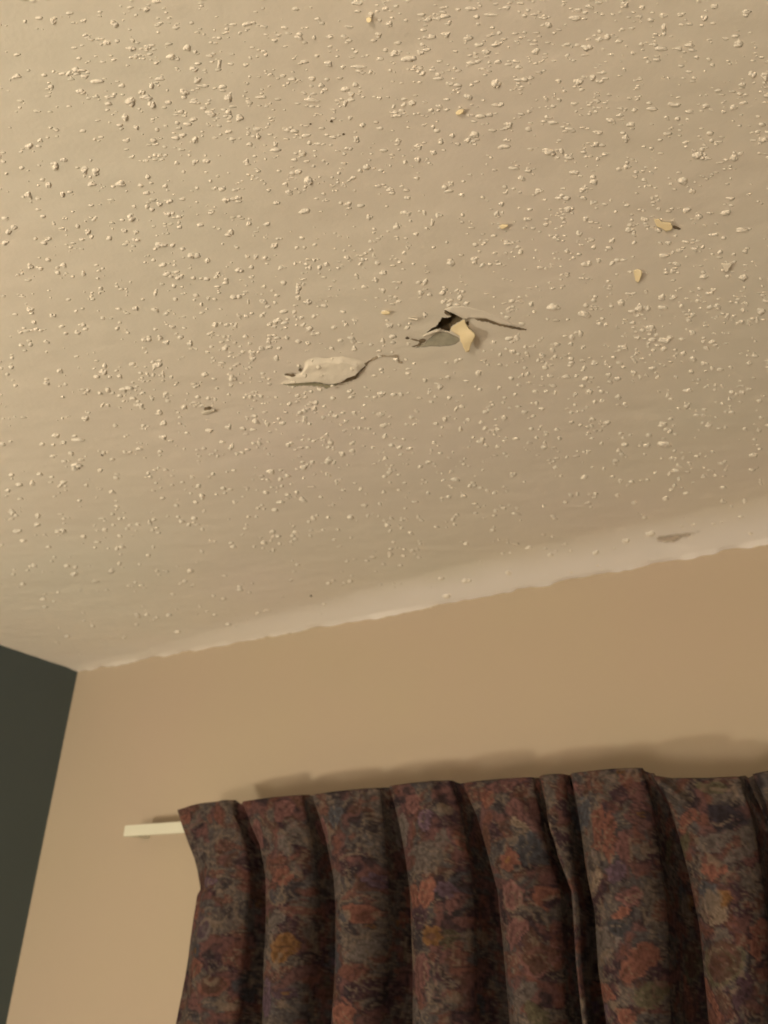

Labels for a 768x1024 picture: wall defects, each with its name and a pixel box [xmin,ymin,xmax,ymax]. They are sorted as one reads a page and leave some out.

peeling [405,311,475,352]